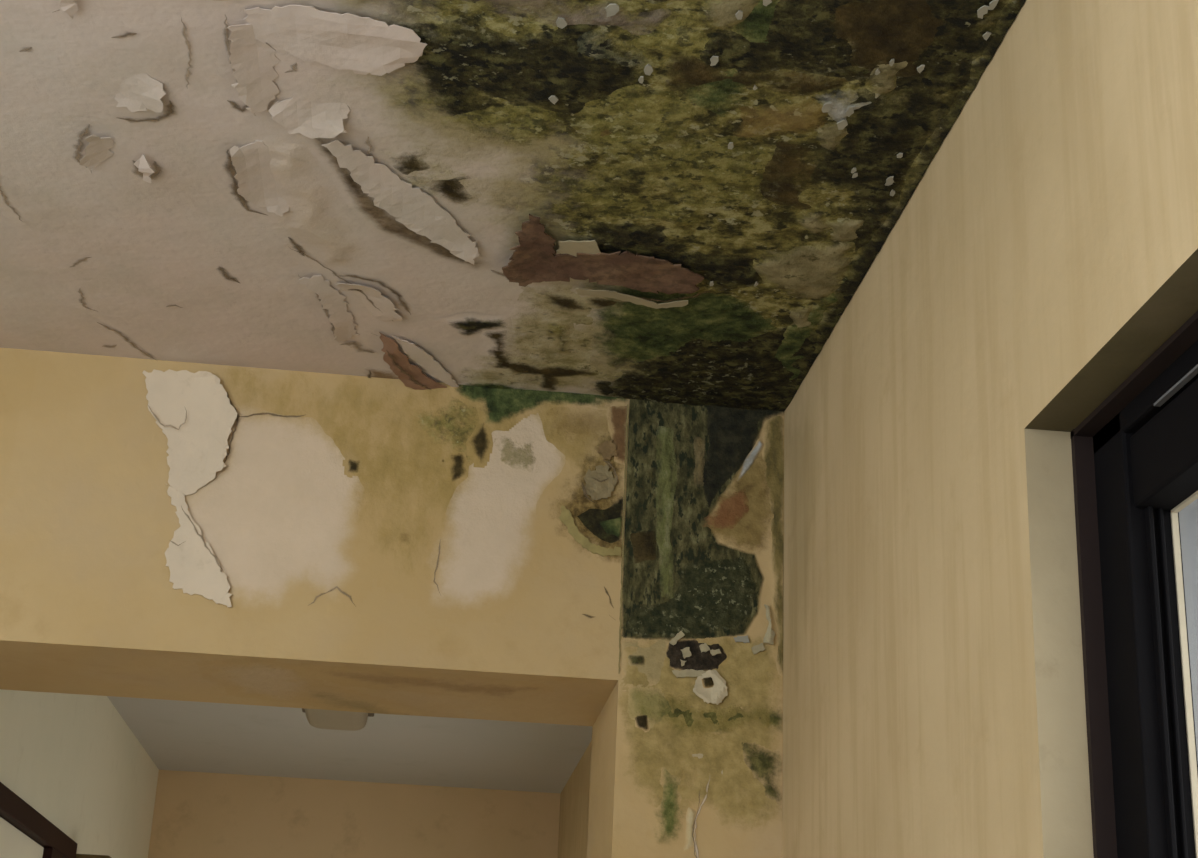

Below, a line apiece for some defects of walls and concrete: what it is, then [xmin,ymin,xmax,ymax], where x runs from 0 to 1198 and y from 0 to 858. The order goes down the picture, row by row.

peeling [298,133,712,309]
spalling [142,369,374,624]
peeling [351,332,459,390]
spalling [414,413,566,624]
water stain [173,0,1025,855]
spalling [700,437,774,564]
spalling [619,604,775,705]